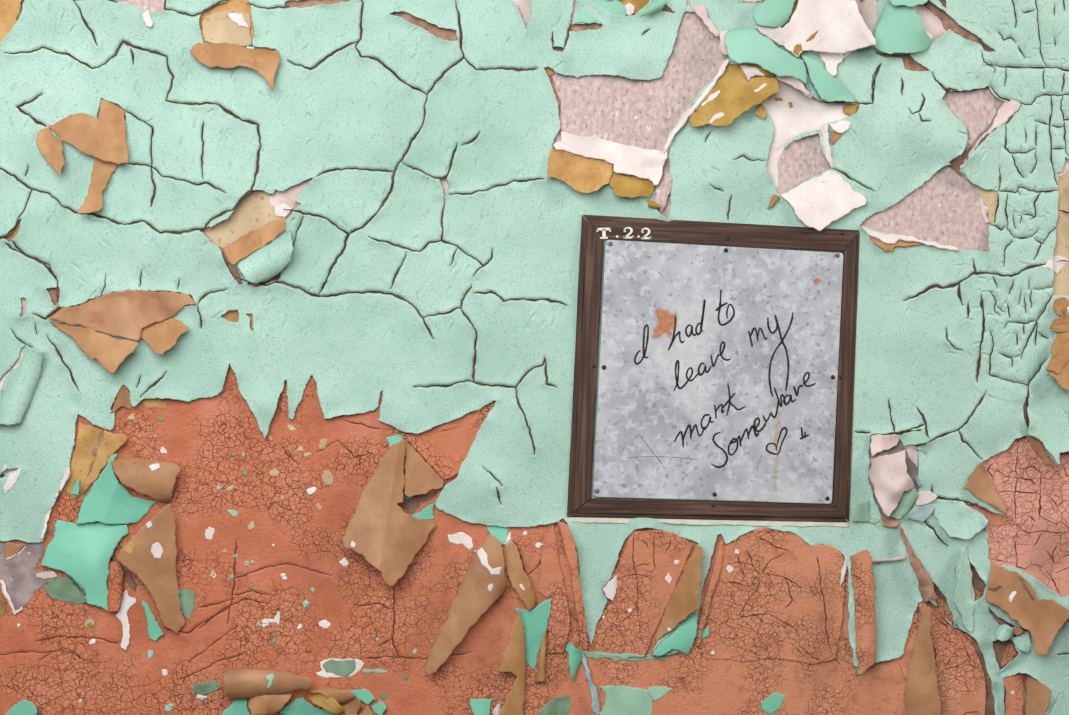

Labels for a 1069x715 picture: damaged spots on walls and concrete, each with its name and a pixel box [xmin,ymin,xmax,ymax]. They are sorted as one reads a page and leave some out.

peeling [36,98,129,214]
peeling [0,415,185,659]
peeling [46,287,196,374]
crack [0,0,261,391]
crack [136,371,167,397]
crack [164,0,567,455]
peeling [339,401,495,587]
crack [551,24,571,49]
peeling [413,429,1069,715]
peeling [544,0,1022,253]
crack [800,55,958,122]
crack [855,0,1069,592]